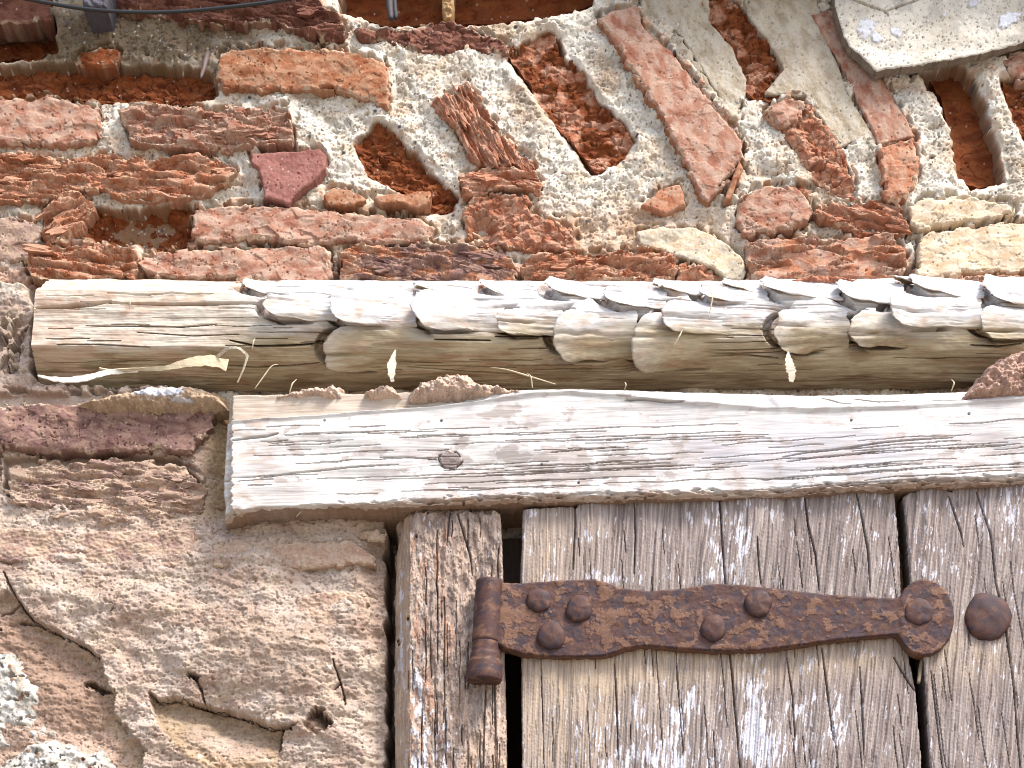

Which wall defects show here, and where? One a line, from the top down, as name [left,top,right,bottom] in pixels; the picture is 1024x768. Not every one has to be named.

crack [5,575,100,659]
crack [153,677,295,744]